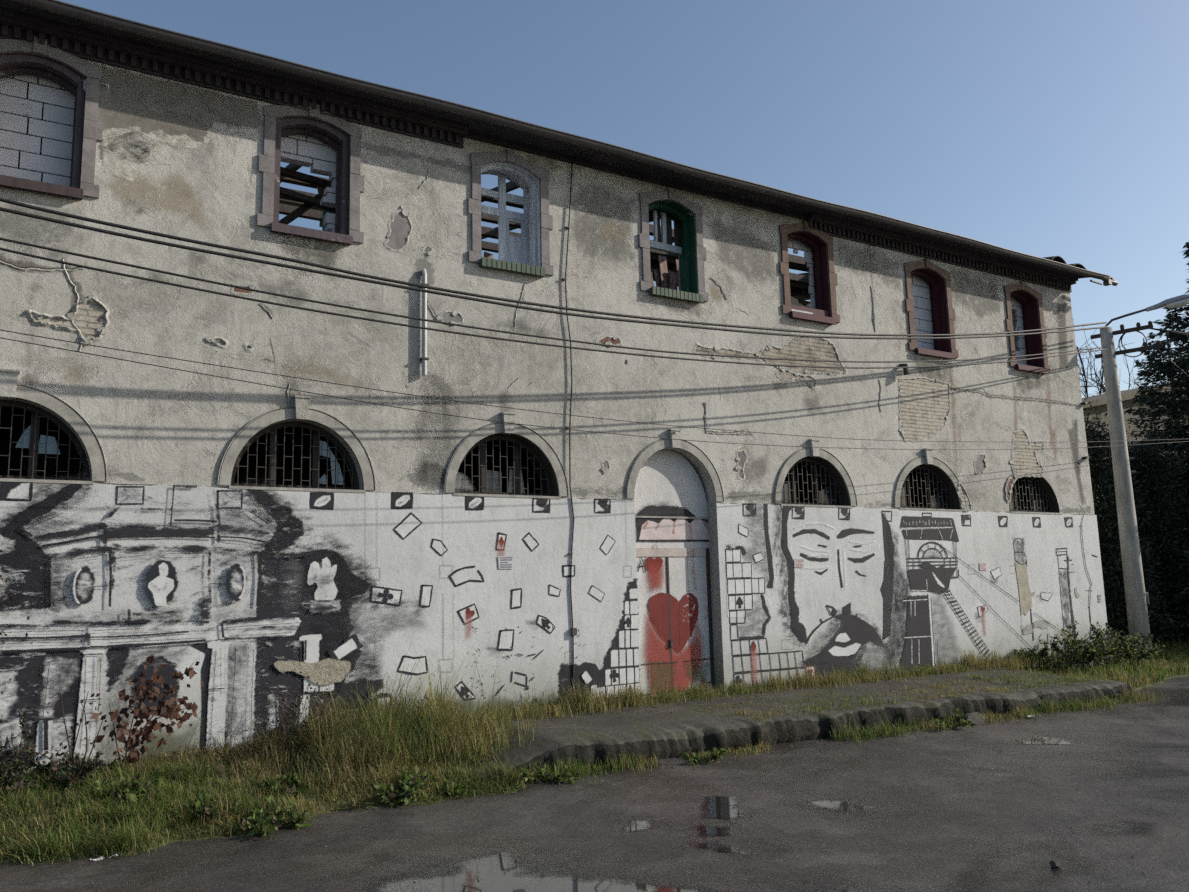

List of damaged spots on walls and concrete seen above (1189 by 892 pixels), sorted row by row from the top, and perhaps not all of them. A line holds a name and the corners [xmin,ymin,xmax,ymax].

peeling [83,68,262,181]
flaking render [383,205,433,256]
crack [0,257,84,351]
flaking render [693,334,848,390]
flaking render [898,376,950,443]